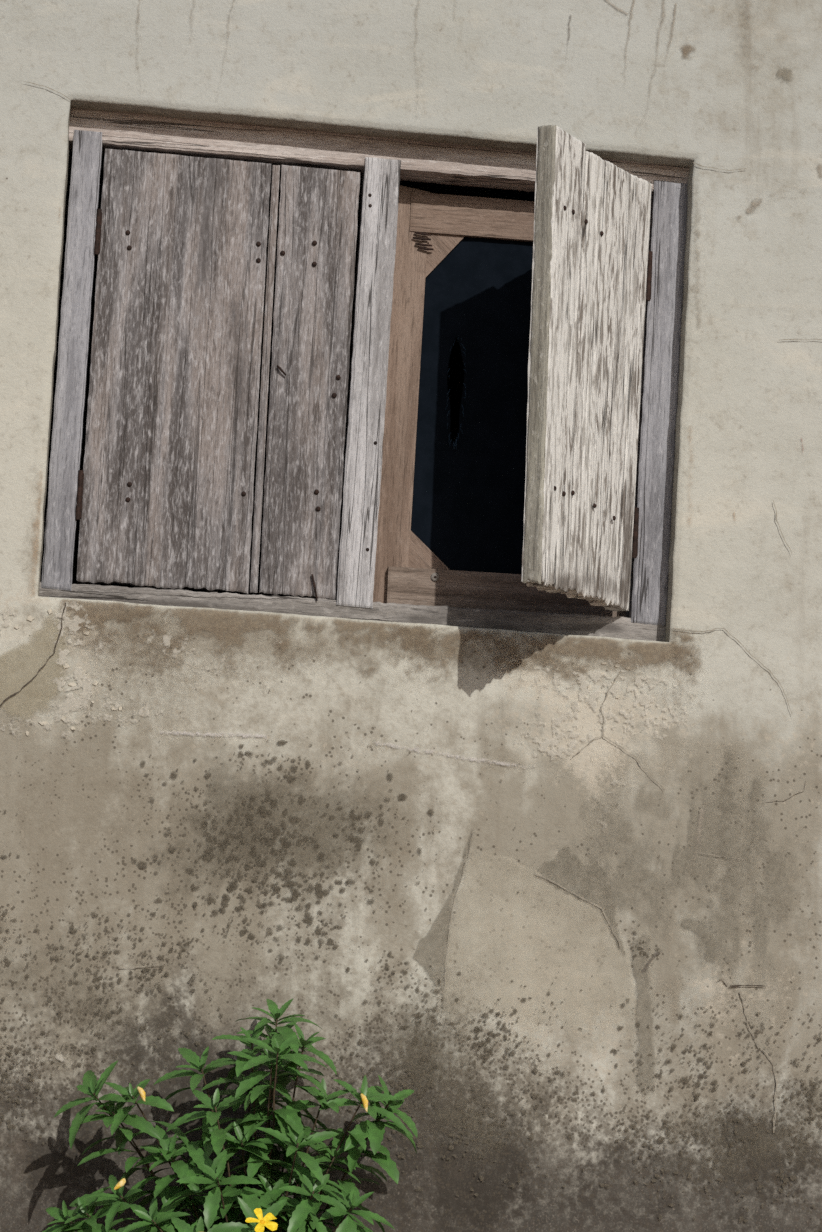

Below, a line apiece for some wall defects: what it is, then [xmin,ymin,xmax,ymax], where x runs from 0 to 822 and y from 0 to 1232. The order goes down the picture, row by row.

crack [0,603,66,707]
damp [63,599,696,766]
damp [0,740,407,1146]
damp [332,832,605,1196]
damp [598,920,822,1232]